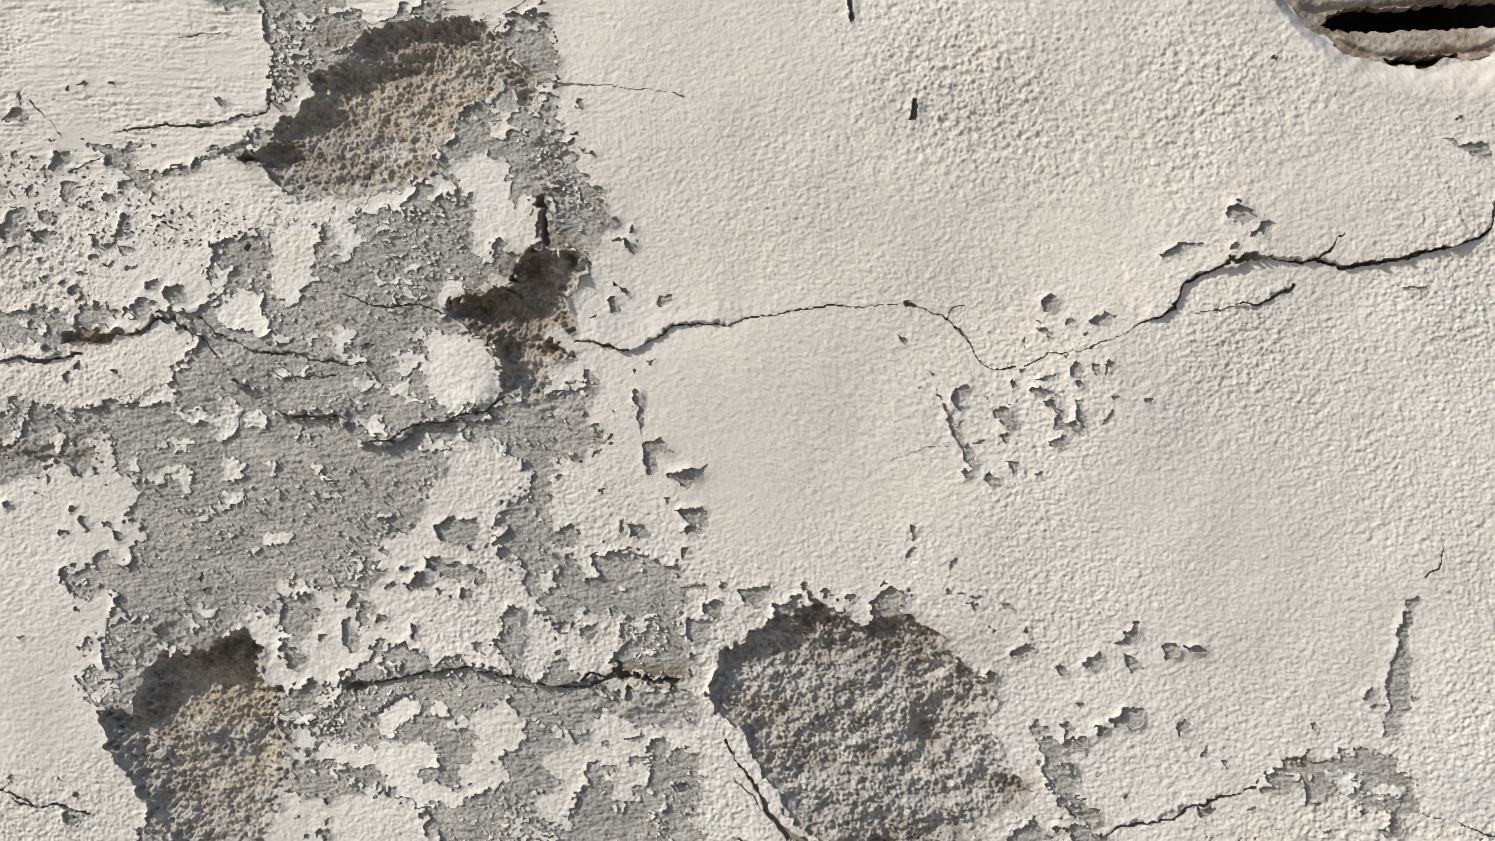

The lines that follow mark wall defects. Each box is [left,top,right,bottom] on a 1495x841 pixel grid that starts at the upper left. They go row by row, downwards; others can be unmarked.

peeling [1445,116,1492,160]
peeling [1159,242,1203,259]
crack [574,210,1493,370]
peeling [0,0,1144,841]
peeling [1161,643,1207,661]
peeling [1176,719,1191,737]
peeling [1197,596,1422,841]
crack [1,788,91,815]
crack [724,738,808,841]
crack [1099,786,1256,837]
crack [1423,813,1495,837]